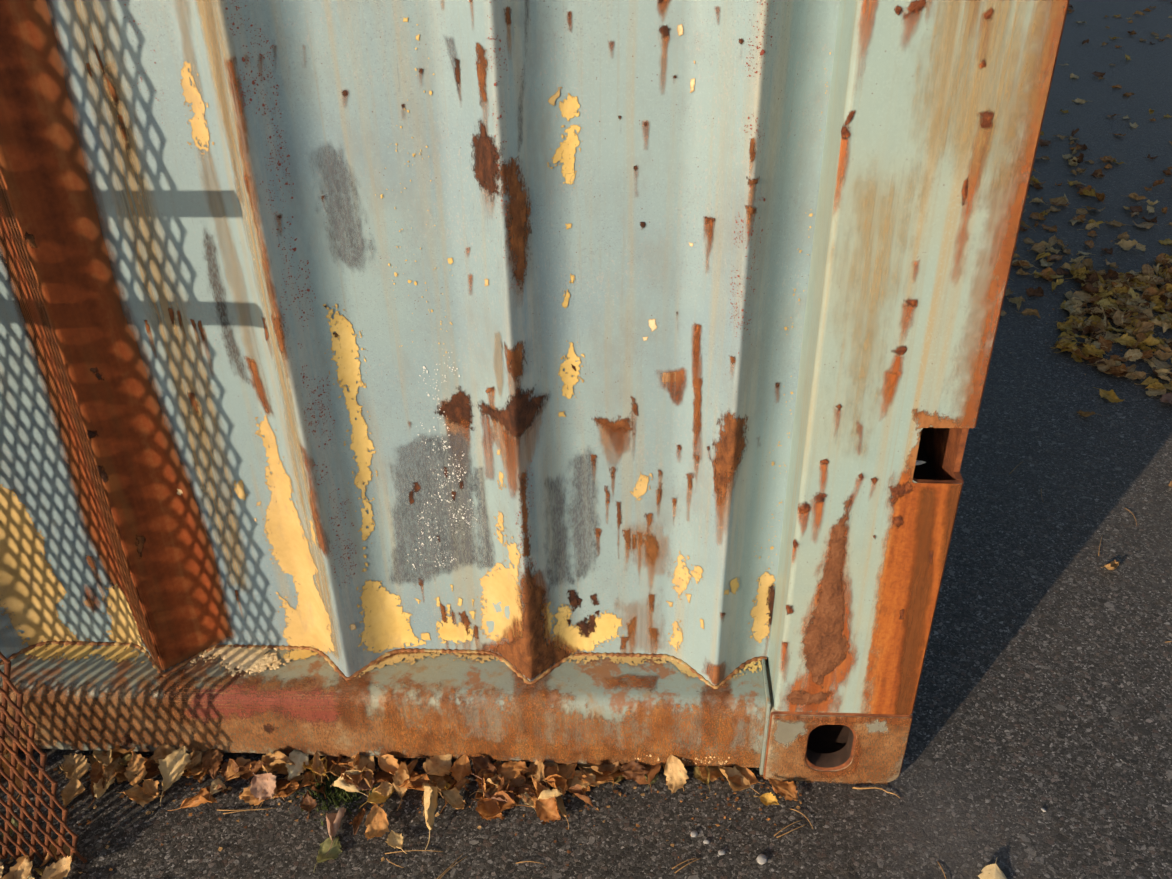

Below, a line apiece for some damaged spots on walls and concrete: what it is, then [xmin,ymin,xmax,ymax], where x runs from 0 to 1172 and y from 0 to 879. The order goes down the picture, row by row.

peeling [180,61,214,155]
peeling [547,87,581,185]
peeling [561,274,575,308]
corrosion [0,0,765,768]
peeling [557,340,585,417]
corrosion [767,0,1068,784]
peeling [0,484,146,664]
peeling [188,409,335,677]
peeling [323,303,523,678]
peeling [542,551,704,682]
peeling [722,660,762,686]